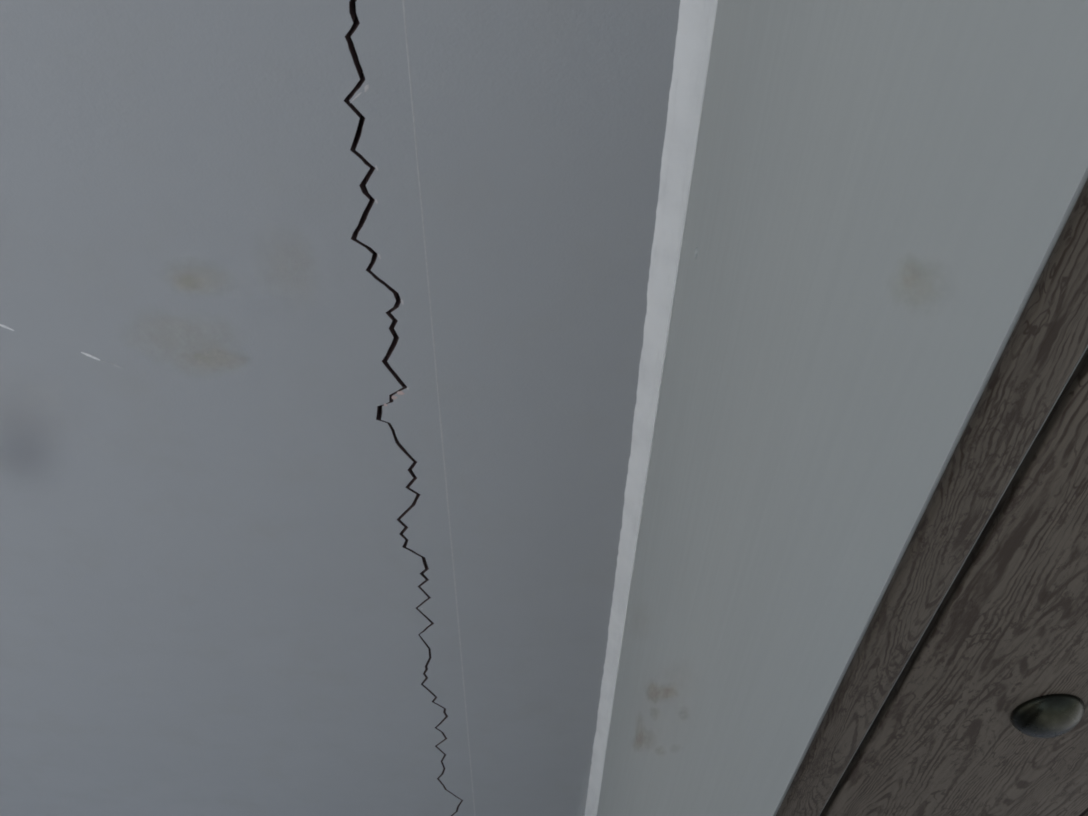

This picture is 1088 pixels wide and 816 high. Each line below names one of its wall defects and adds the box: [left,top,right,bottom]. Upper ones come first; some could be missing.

crack [344,0,463,816]